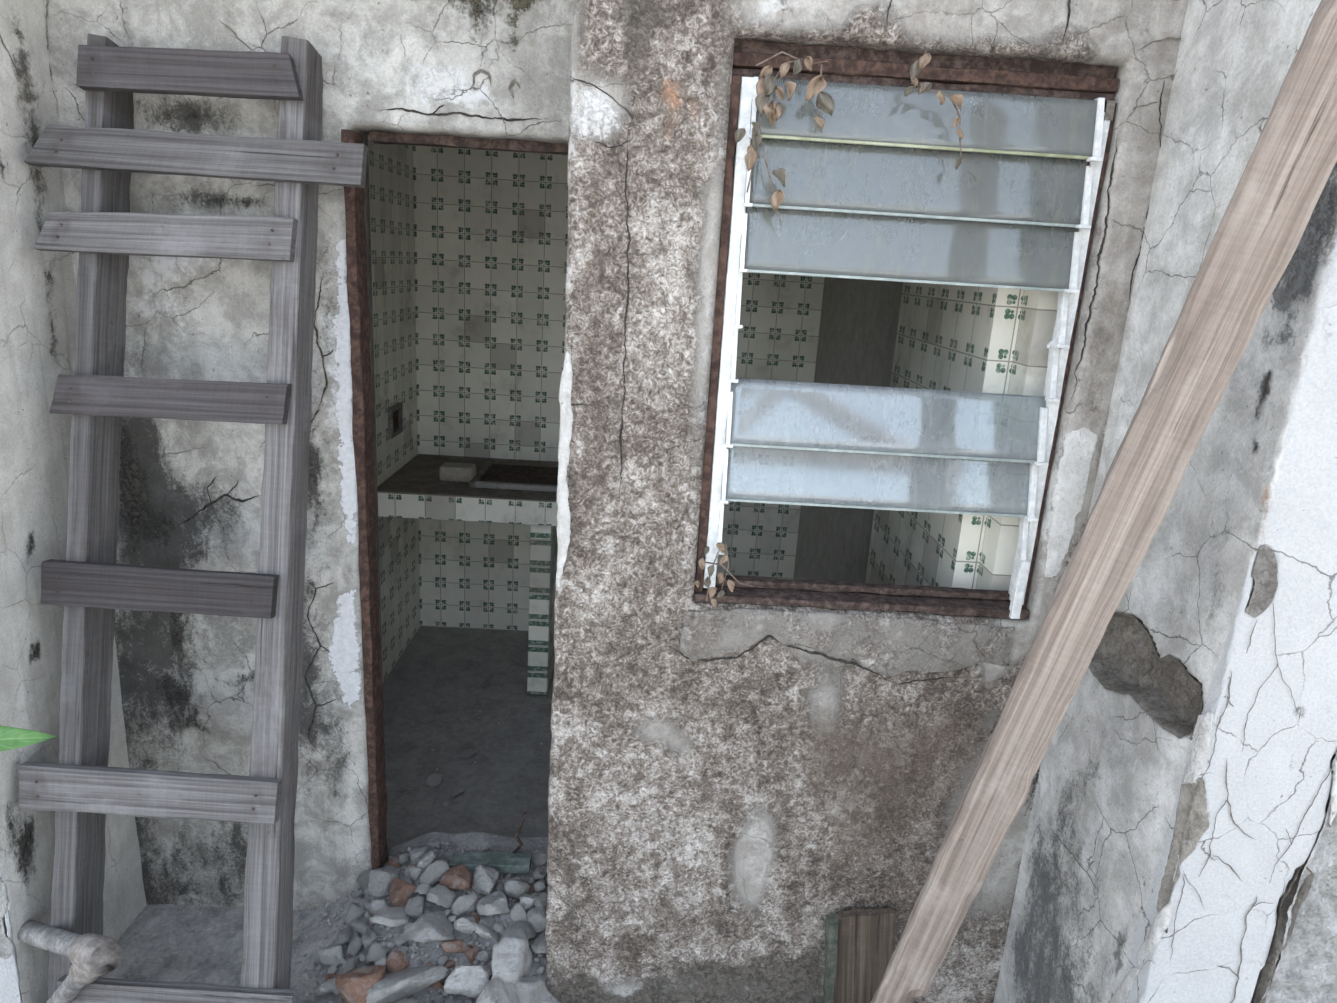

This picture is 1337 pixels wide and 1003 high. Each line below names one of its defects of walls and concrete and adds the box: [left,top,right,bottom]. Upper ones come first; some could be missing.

water stain [449,0,535,51]
crack [1060,0,1071,44]
crack [378,68,547,122]
water stain [1270,164,1337,326]
crack [561,79,637,508]
water stain [119,425,175,550]
flaking render [1246,546,1278,618]
water stain [169,612,189,654]
crack [671,635,950,685]
water stain [155,675,209,736]
flaking render [1088,612,1214,965]
crack [1170,602,1334,1003]